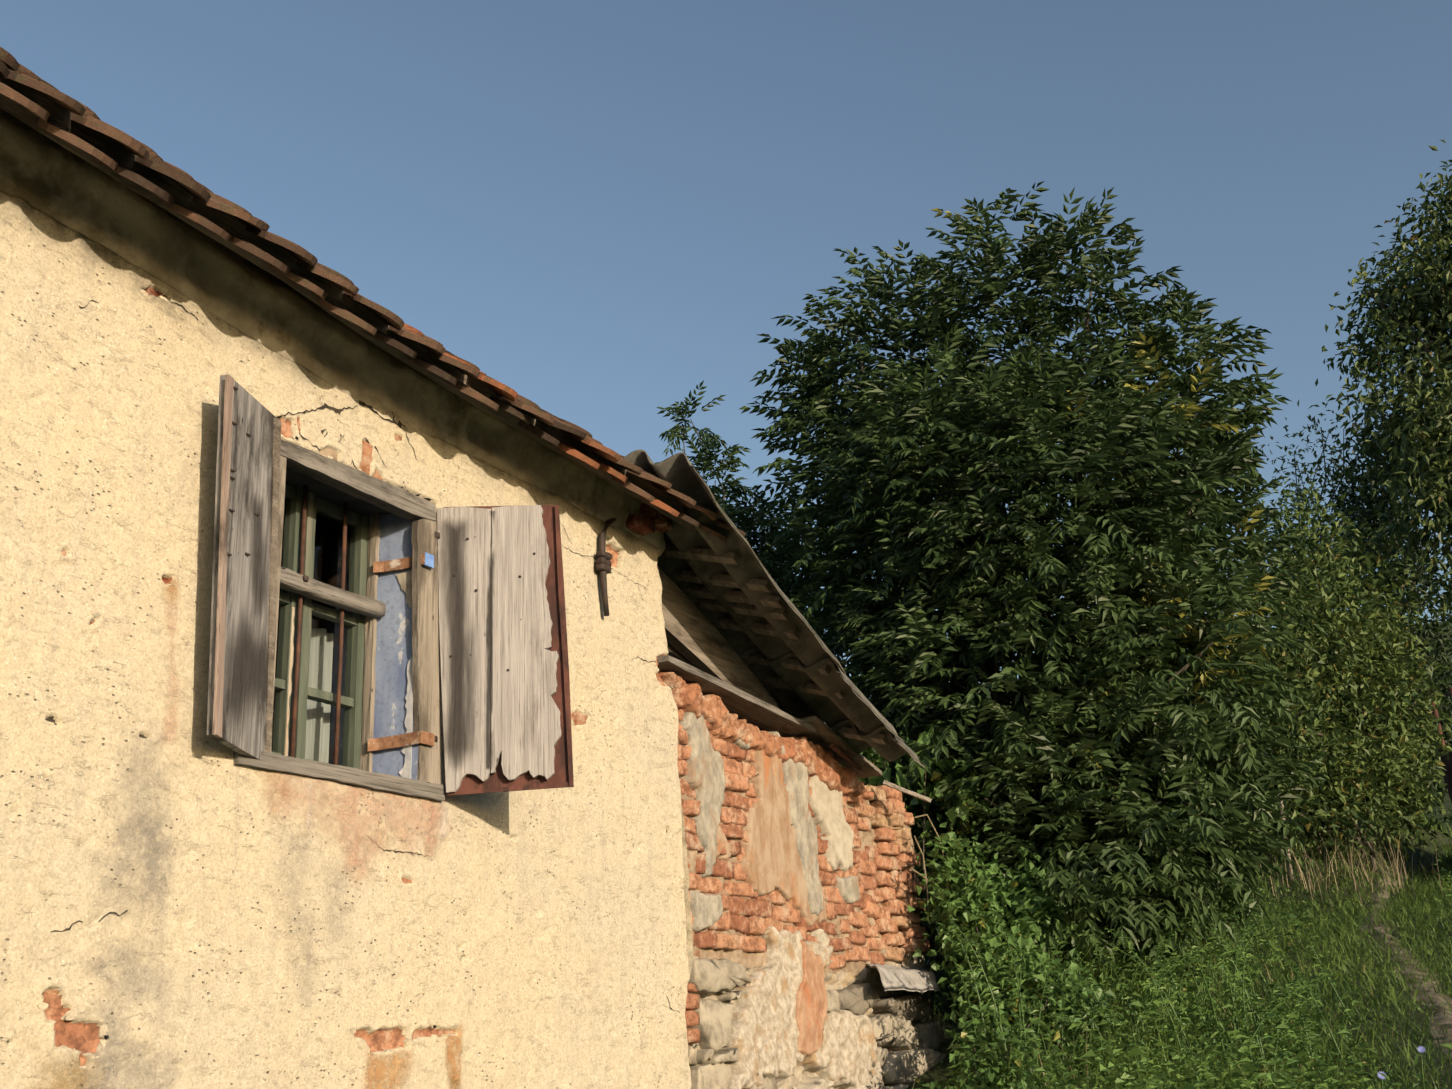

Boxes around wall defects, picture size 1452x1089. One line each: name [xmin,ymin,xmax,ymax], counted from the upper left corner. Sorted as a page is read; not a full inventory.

spalling [278,417,301,441]
crack [277,400,431,501]
spalling [358,441,383,480]
crack [51,910,128,932]
spalling [37,989,110,1066]
rust [367,1054,406,1089]
rust [447,1029,461,1089]